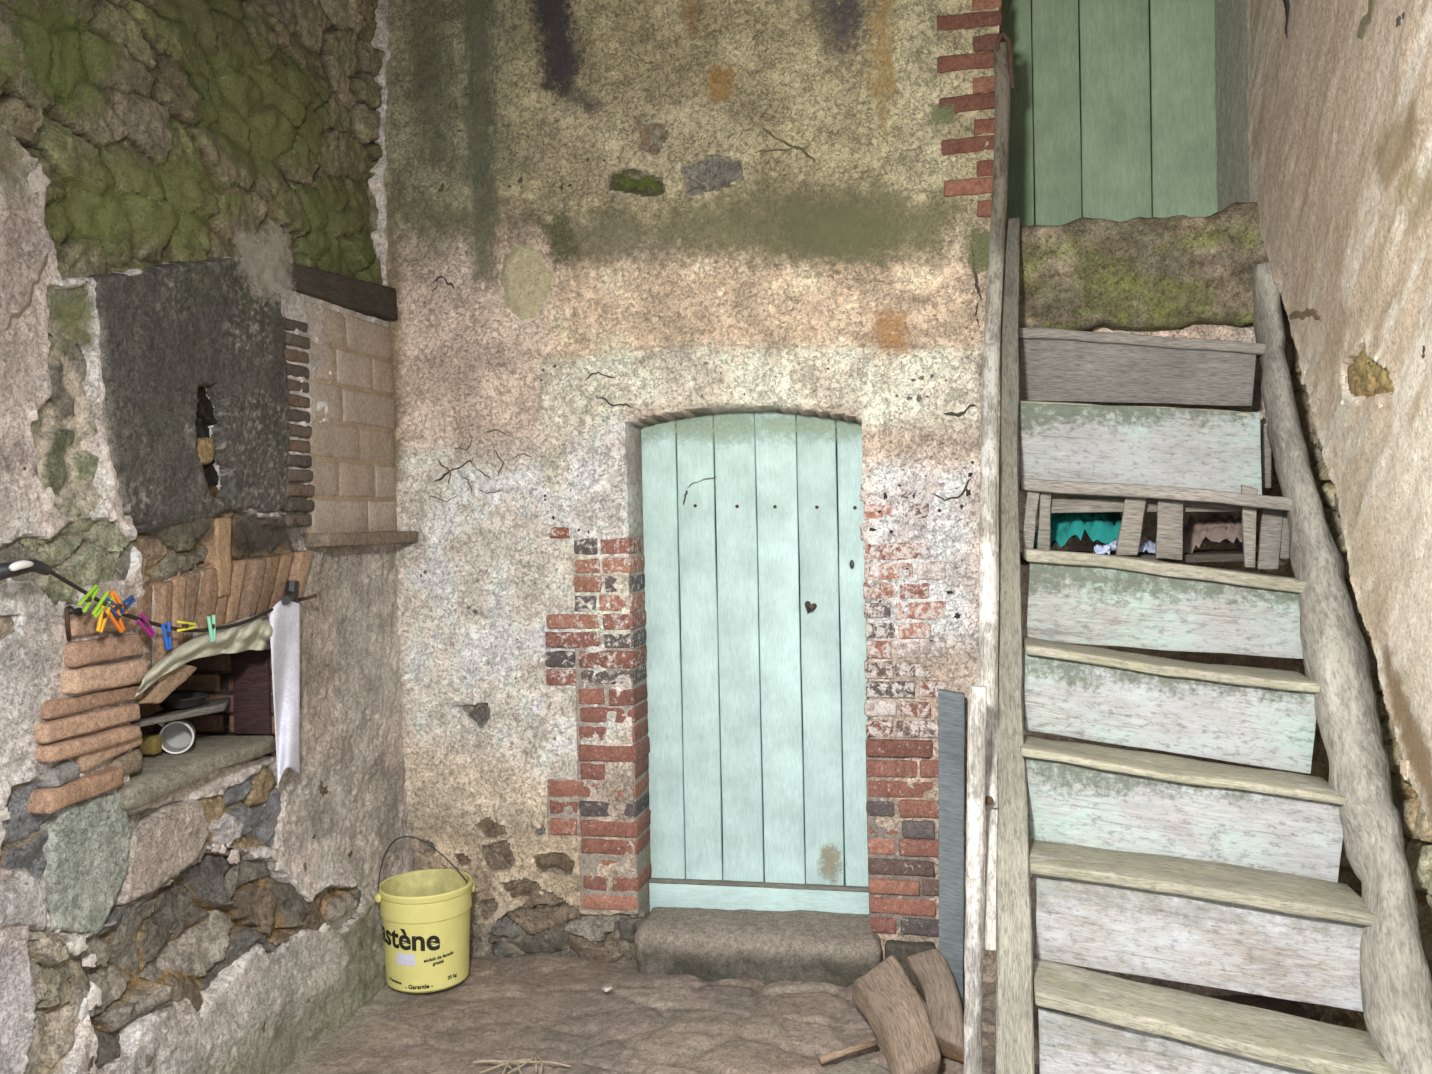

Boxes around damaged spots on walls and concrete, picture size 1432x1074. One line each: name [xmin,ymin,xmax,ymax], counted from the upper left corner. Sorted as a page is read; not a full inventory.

leakage [465,0,495,278]
leakage [530,0,580,93]
crack [1282,0,1290,38]
flaking render [0,0,388,616]
crack [431,429,531,502]
flaking render [0,615,15,639]
flaking render [412,494,652,964]
flaking render [860,475,961,937]
flaking render [1283,313,1432,977]
flaking render [0,766,362,1074]
flaking render [1297,1001,1367,1031]